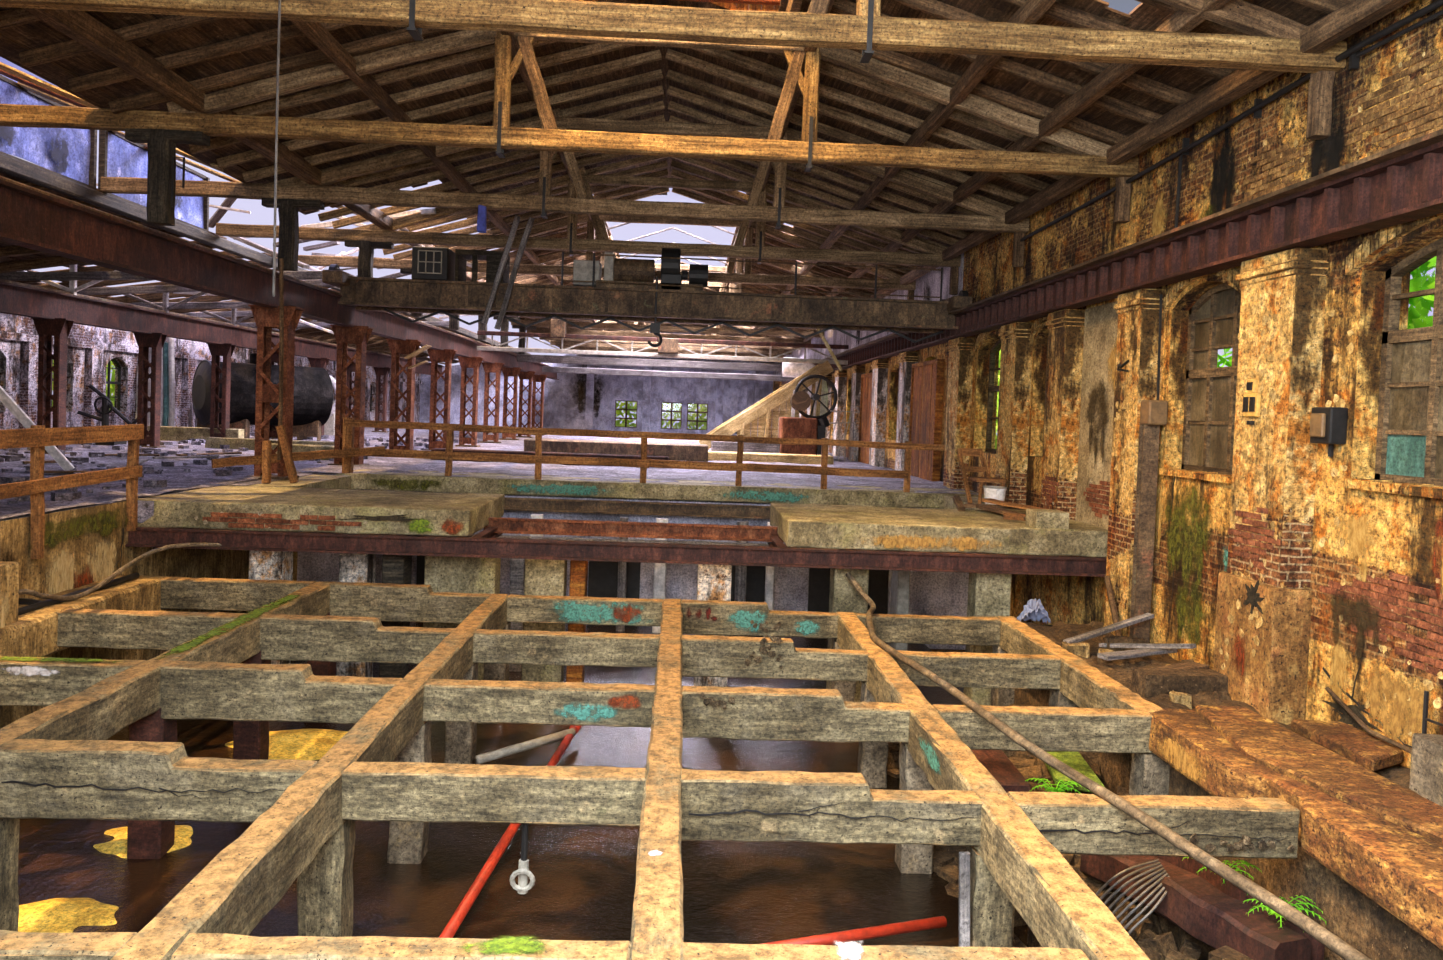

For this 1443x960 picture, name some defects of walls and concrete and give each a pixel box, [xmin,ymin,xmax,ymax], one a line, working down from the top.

damp [1087,341,1117,468]
damp [1154,467,1203,653]
spalling [1219,507,1281,670]
spalling [1320,572,1443,737]